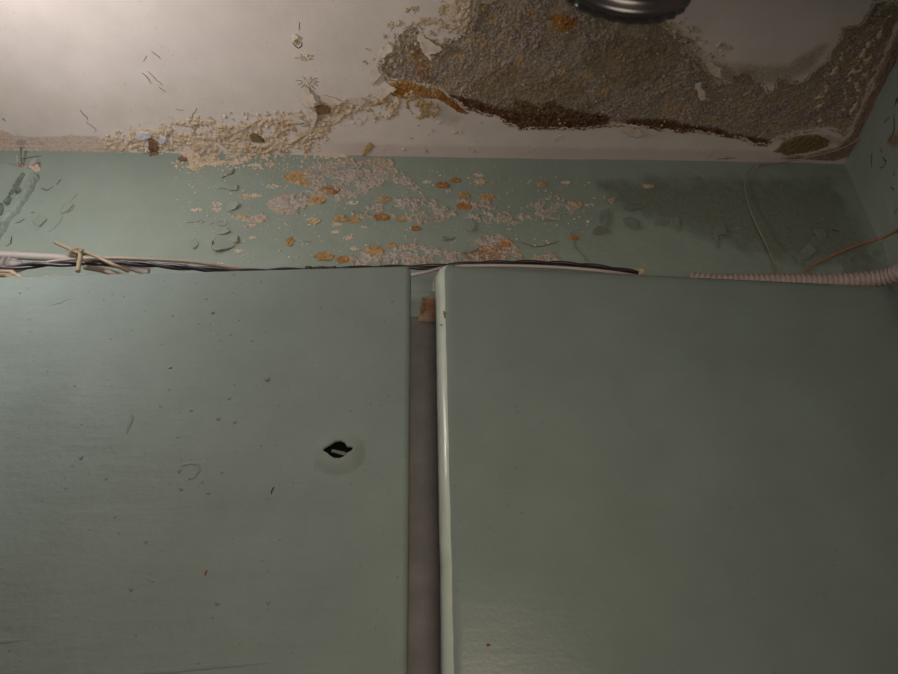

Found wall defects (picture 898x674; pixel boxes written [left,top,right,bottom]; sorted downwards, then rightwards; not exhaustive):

flaking render [0,0,898,174]
rust [385,49,608,131]